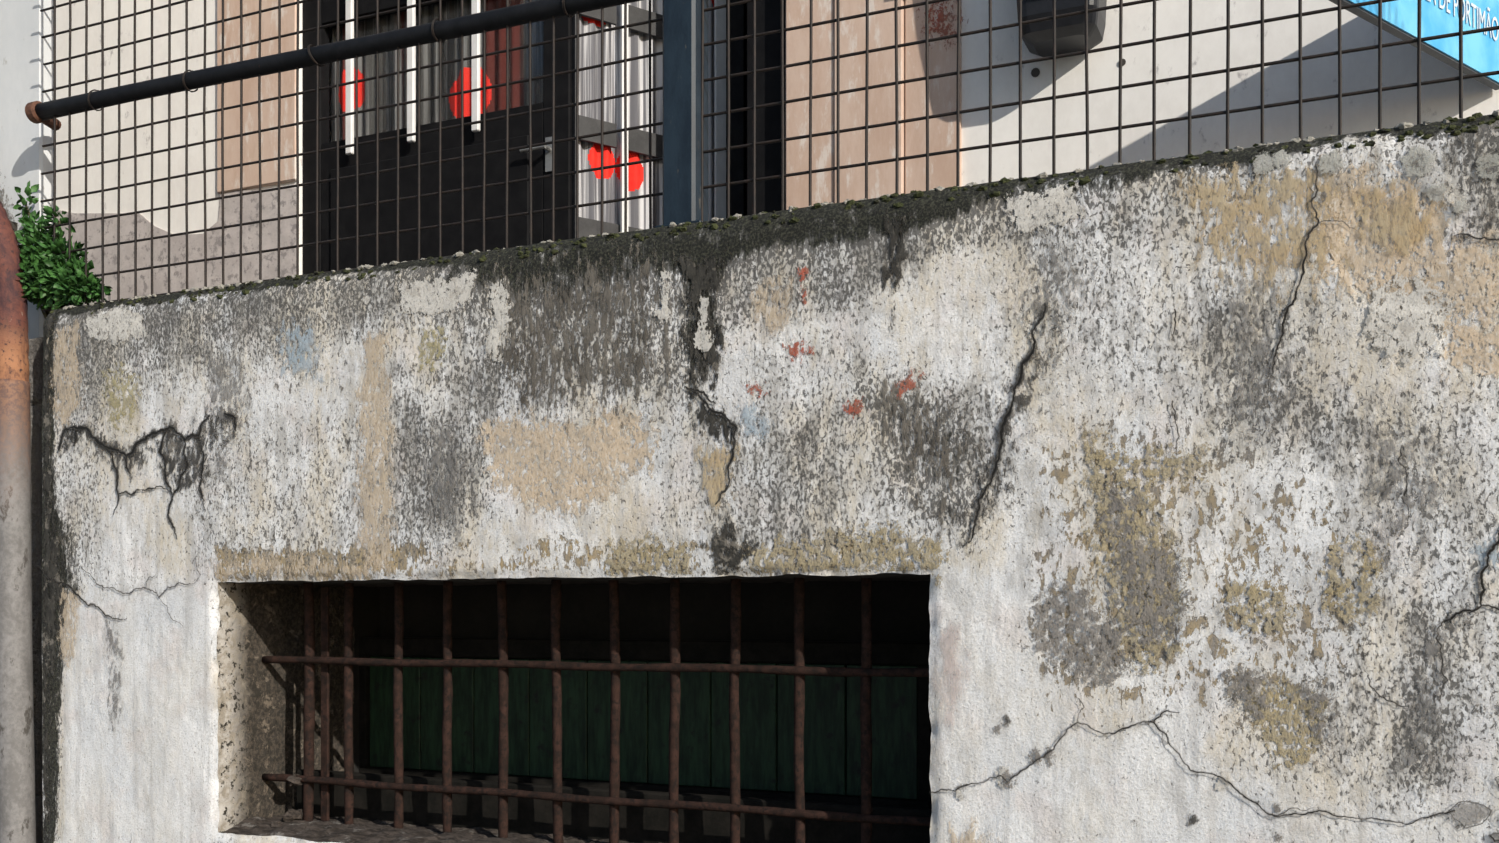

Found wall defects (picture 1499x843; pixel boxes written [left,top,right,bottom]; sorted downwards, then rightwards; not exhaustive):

water stain [469,240,737,437]
water stain [881,210,912,329]
water stain [1014,217,1106,367]
crack [1268,165,1359,389]
spalling [1310,161,1499,387]
crack [36,407,246,628]
water stain [414,412,481,559]
peeling [475,399,666,518]
crack [684,386,741,509]
crack [953,298,1065,556]
crack [1367,533,1499,707]
crack [929,695,1455,825]